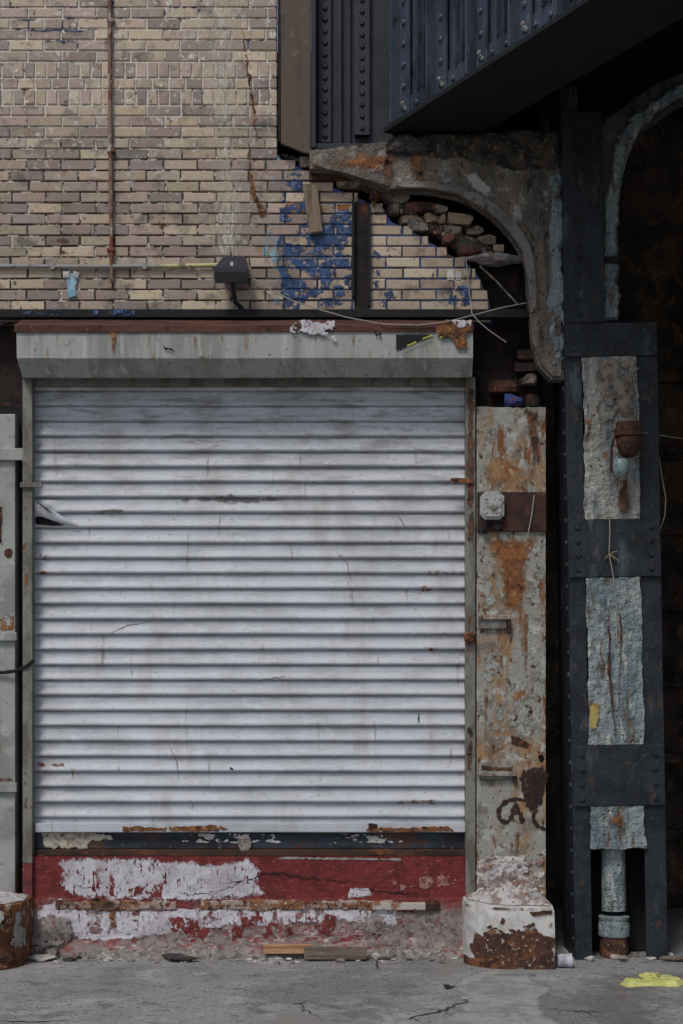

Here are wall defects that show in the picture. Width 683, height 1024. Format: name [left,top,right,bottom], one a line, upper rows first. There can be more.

rust [339,154,396,184]
peeling [277,154,352,342]
spalling [336,181,494,257]
peeling [385,129,564,366]
peeling [372,250,396,307]
rust [436,319,472,349]
rust [467,388,546,670]
rust [122,825,228,833]
peeling [0,832,463,951]
peeling [476,852,545,894]
rust [463,927,555,970]